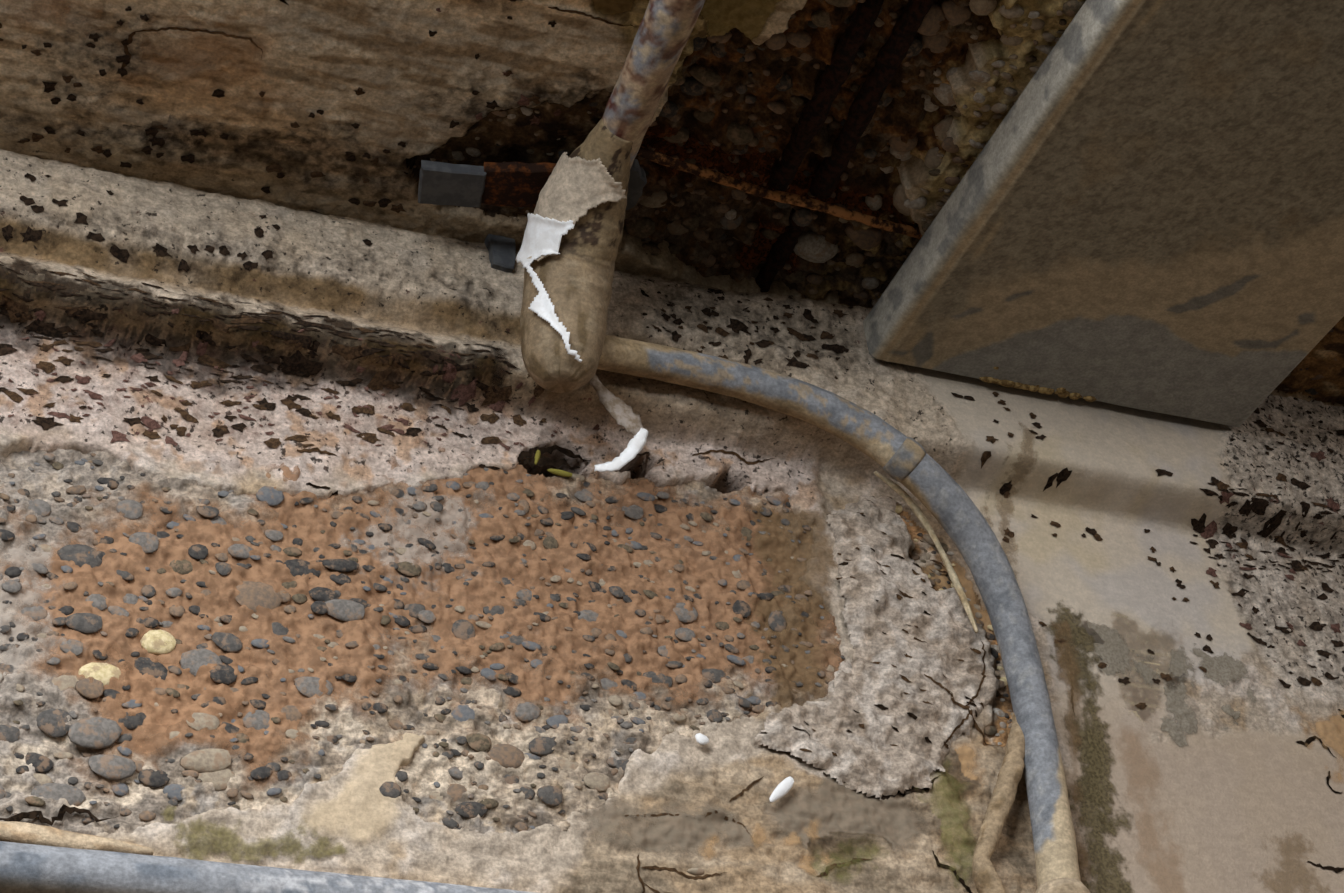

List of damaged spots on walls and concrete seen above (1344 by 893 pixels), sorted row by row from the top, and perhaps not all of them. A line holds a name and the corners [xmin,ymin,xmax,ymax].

peeling [591,0,635,16]
spalling [412,89,612,187]
corrosion [641,125,911,225]
spalling [623,0,1084,309]
damp [981,392,1046,468]
damp [999,480,1013,498]
damp [1043,468,1072,491]
damp [1081,527,1103,541]
damp [1144,529,1189,602]
spalling [0,447,845,836]
crack [823,641,989,800]
damp [1039,604,1133,893]